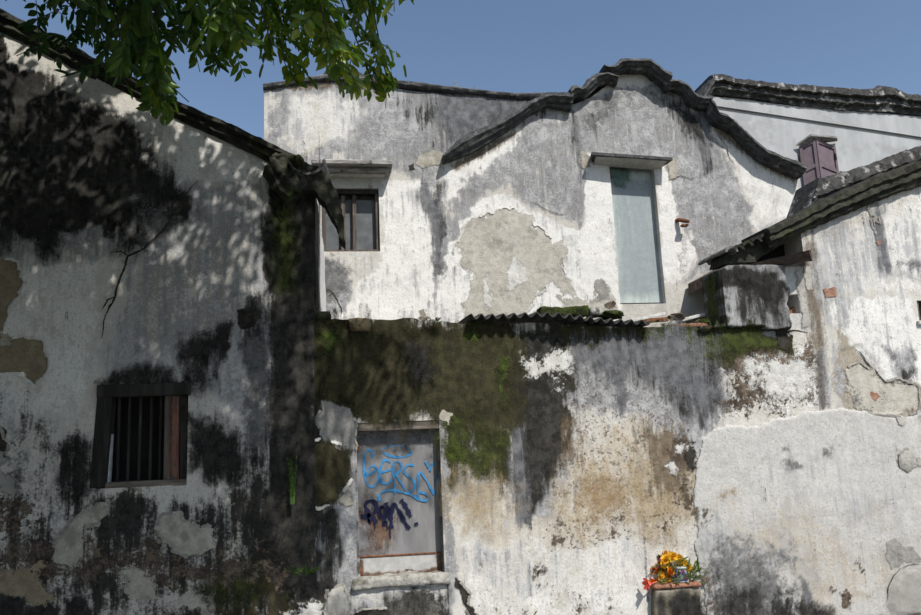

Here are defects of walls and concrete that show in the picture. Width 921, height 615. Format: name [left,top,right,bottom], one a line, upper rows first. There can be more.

water stain [0,46,181,261]
water stain [650,92,711,178]
crack [102,181,198,336]
water stain [415,179,448,277]
flaking render [455,206,618,320]
flaking render [0,257,48,389]
peeling [315,401,358,451]
water stain [439,410,453,426]
water stain [495,320,724,523]
flaking render [845,360,921,418]
flaking render [0,426,326,615]
flaking render [454,577,479,615]